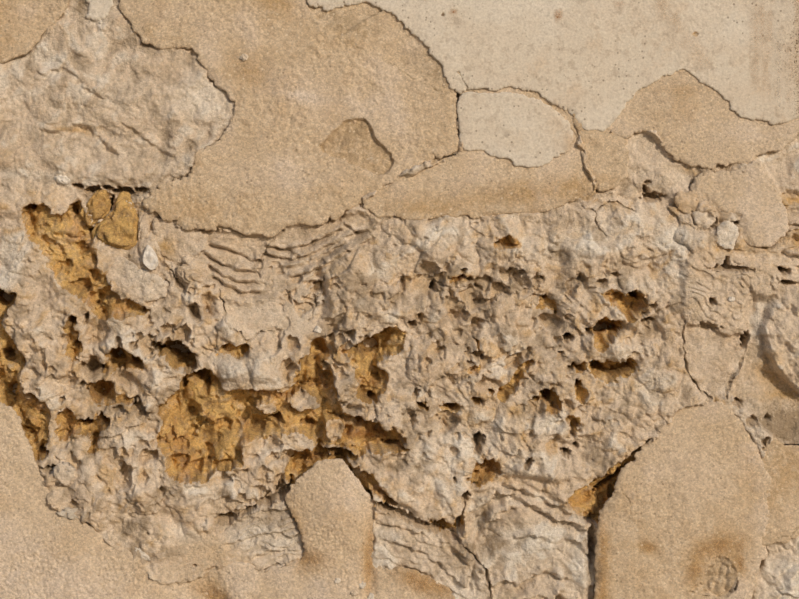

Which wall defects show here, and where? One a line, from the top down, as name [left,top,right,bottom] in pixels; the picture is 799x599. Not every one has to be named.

flaking render [0,0,574,238]
flaking render [572,69,799,192]
spalling [0,86,724,599]
crack [682,320,748,401]
spalling [686,134,799,458]
crack [450,494,493,599]
spalling [692,554,738,599]
spalling [752,535,799,599]